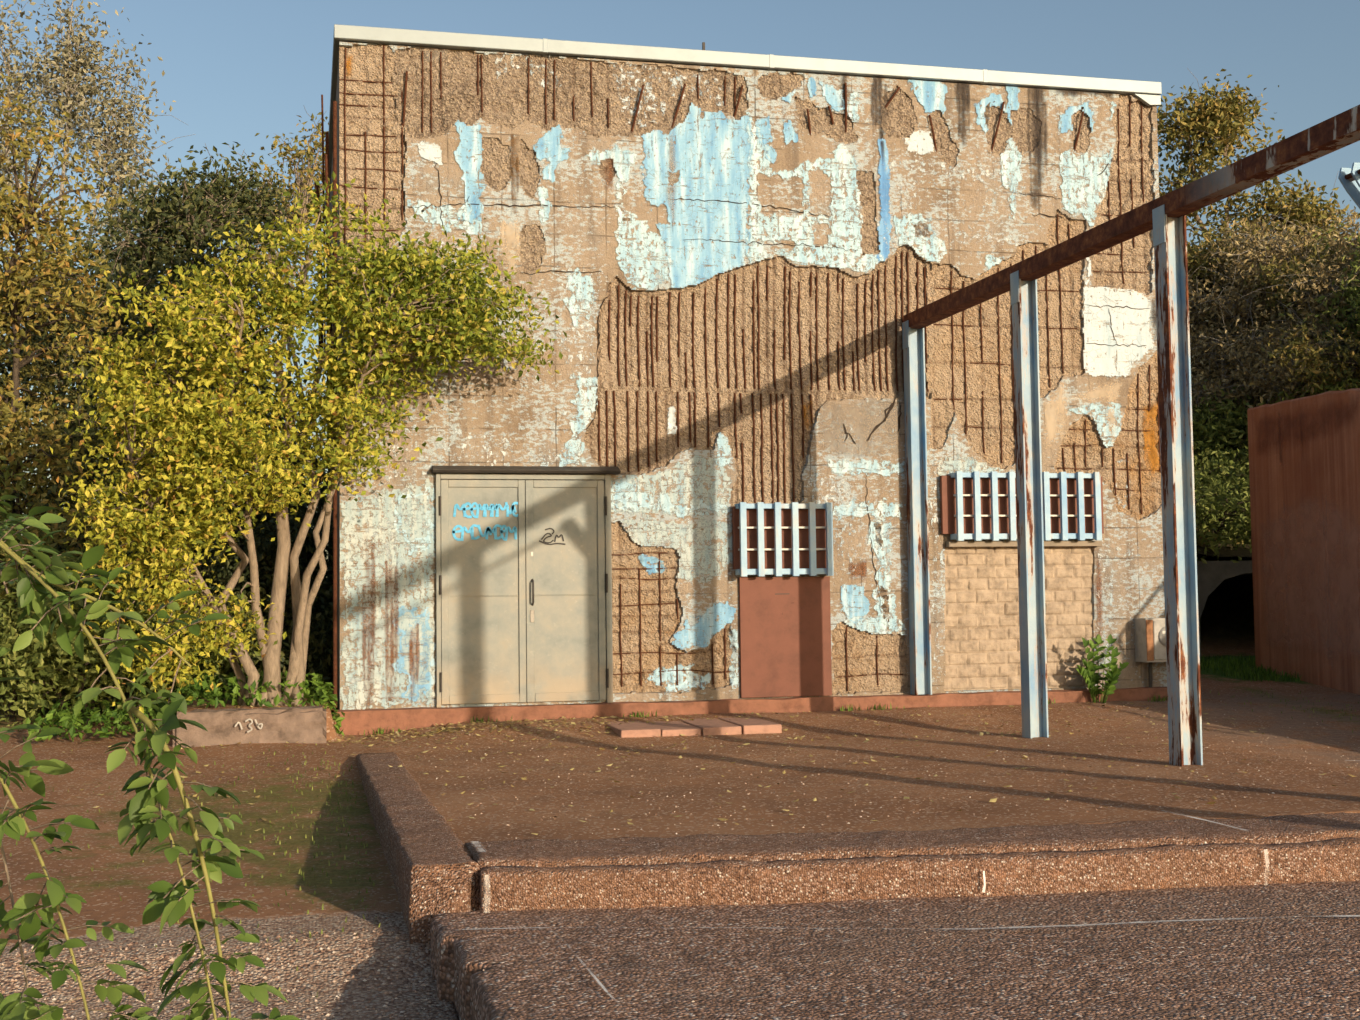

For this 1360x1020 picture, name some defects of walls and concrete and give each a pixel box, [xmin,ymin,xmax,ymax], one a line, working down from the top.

spalling [339,45,1162,710]
rust [1144,406,1159,472]